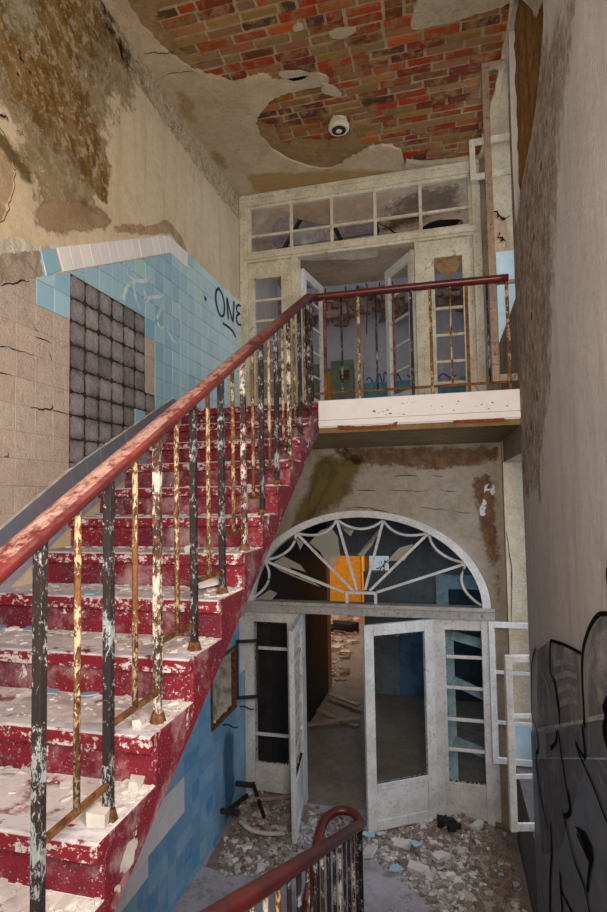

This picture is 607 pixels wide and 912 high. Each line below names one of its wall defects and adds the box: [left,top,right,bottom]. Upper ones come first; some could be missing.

water stain [0,0,143,208]
spalling [0,128,17,223]
spalling [128,0,574,508]
crack [0,327,52,361]
flaking render [0,250,155,526]
water stain [292,445,498,538]
water stain [473,475,500,563]
peeling [480,484,495,516]